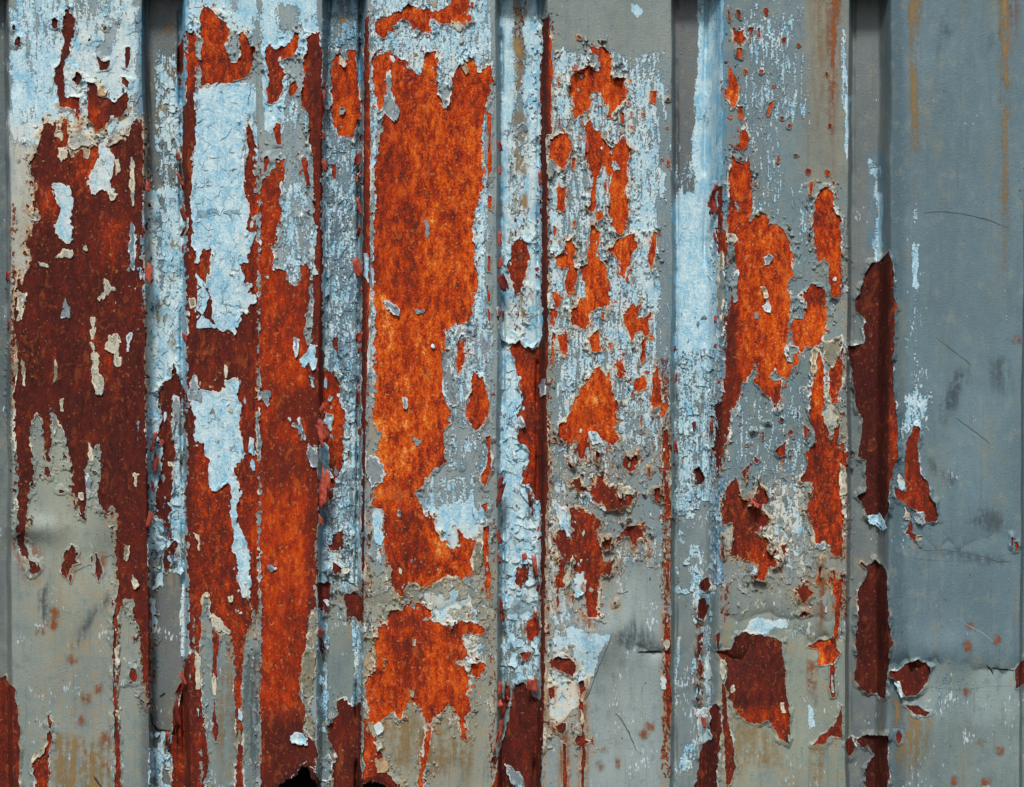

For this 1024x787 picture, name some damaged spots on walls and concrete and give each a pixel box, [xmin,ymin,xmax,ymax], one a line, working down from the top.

peeling [321,0,433,73]
peeling [553,70,580,184]
peeling [593,93,616,203]
peeling [619,54,667,203]
peeling [754,4,810,134]
peeling [56,9,259,590]
corrosion [0,0,681,787]
peeling [318,123,392,707]
peeling [408,122,815,764]
corrosion [687,0,945,787]
peeling [148,671,187,787]
peeling [316,608,330,733]